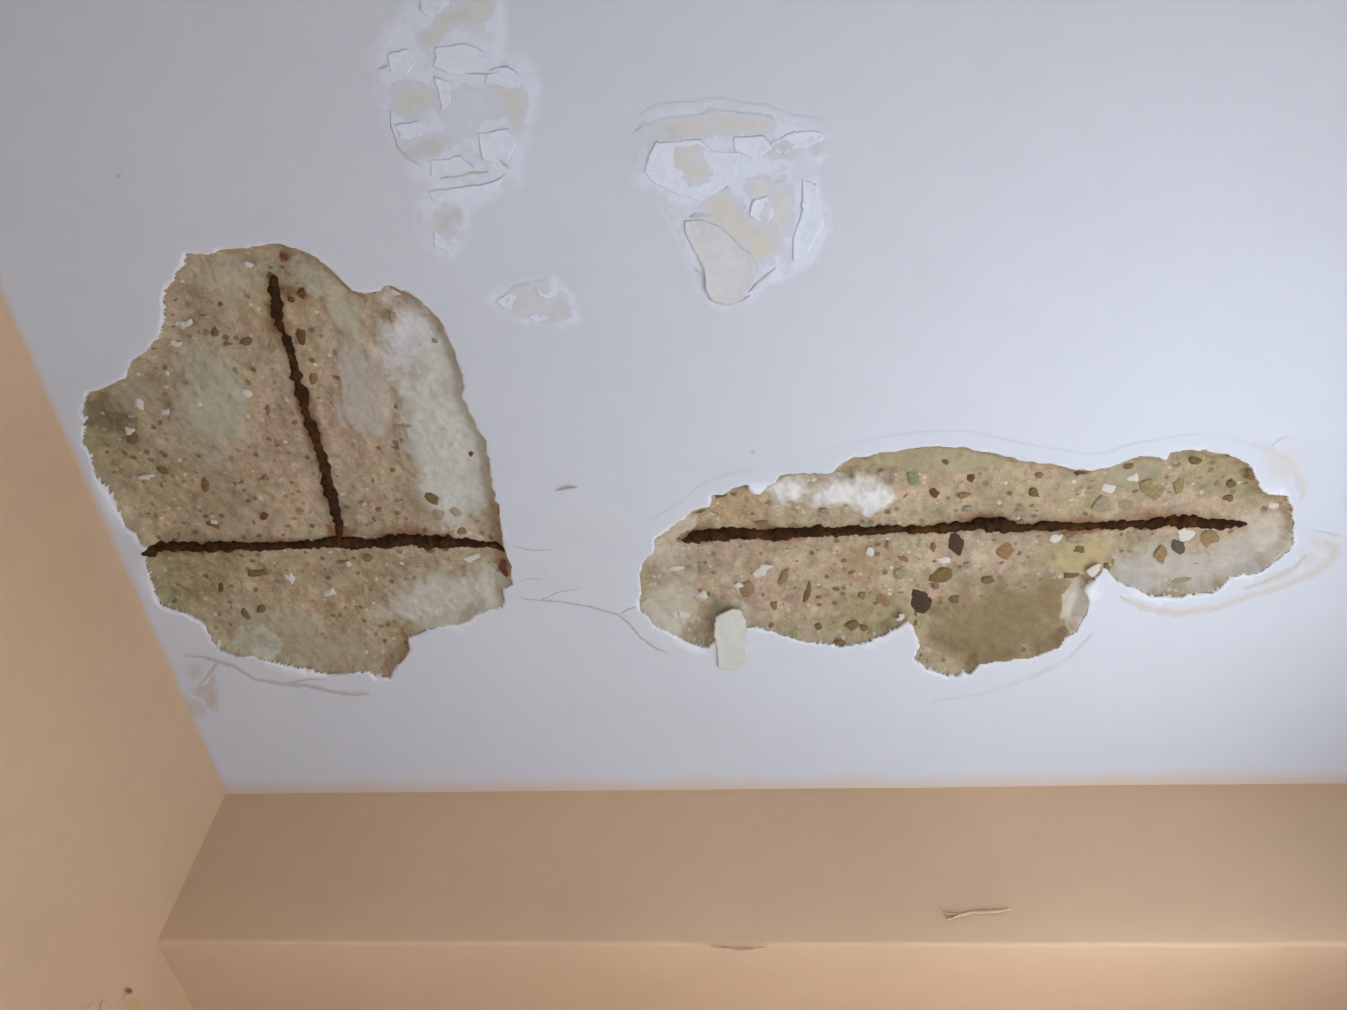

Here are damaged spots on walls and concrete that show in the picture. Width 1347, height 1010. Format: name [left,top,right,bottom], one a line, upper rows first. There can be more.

spalling [61,224,522,691]
spalling [624,430,1345,702]